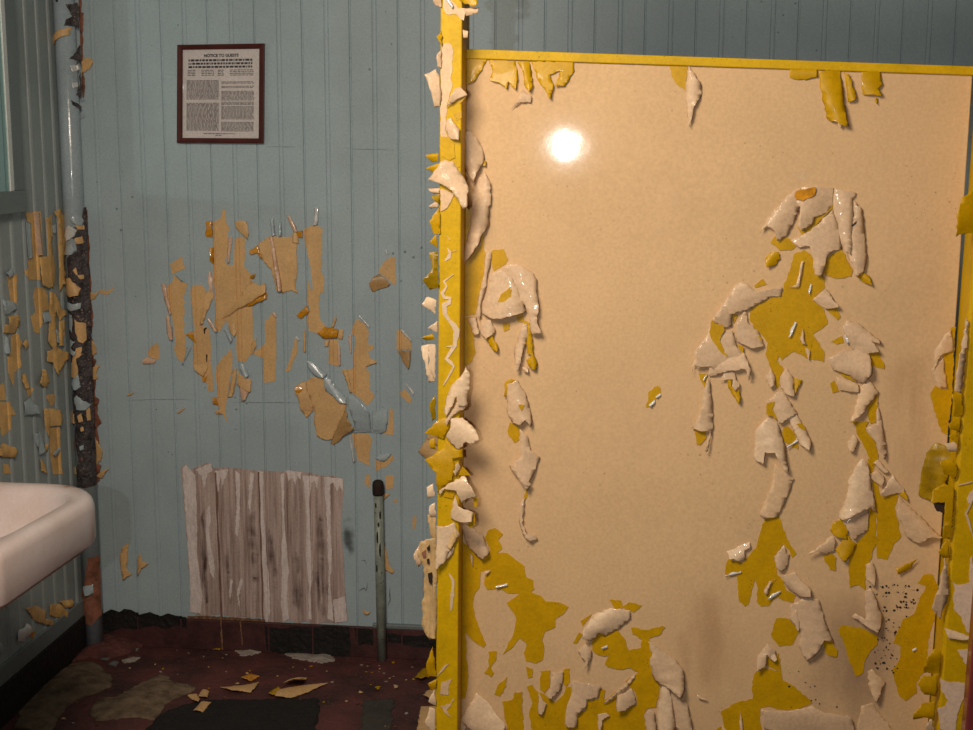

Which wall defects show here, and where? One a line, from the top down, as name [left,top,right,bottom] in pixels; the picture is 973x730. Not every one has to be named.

peeling [79,0,93,119]
peeling [433,0,479,38]
peeling [669,65,702,125]
peeling [789,69,882,128]
peeling [0,209,69,475]
peeling [86,209,116,483]
peeling [142,343,159,364]
peeling [161,208,398,503]
peeling [396,30,692,730]
peeling [691,186,973,730]